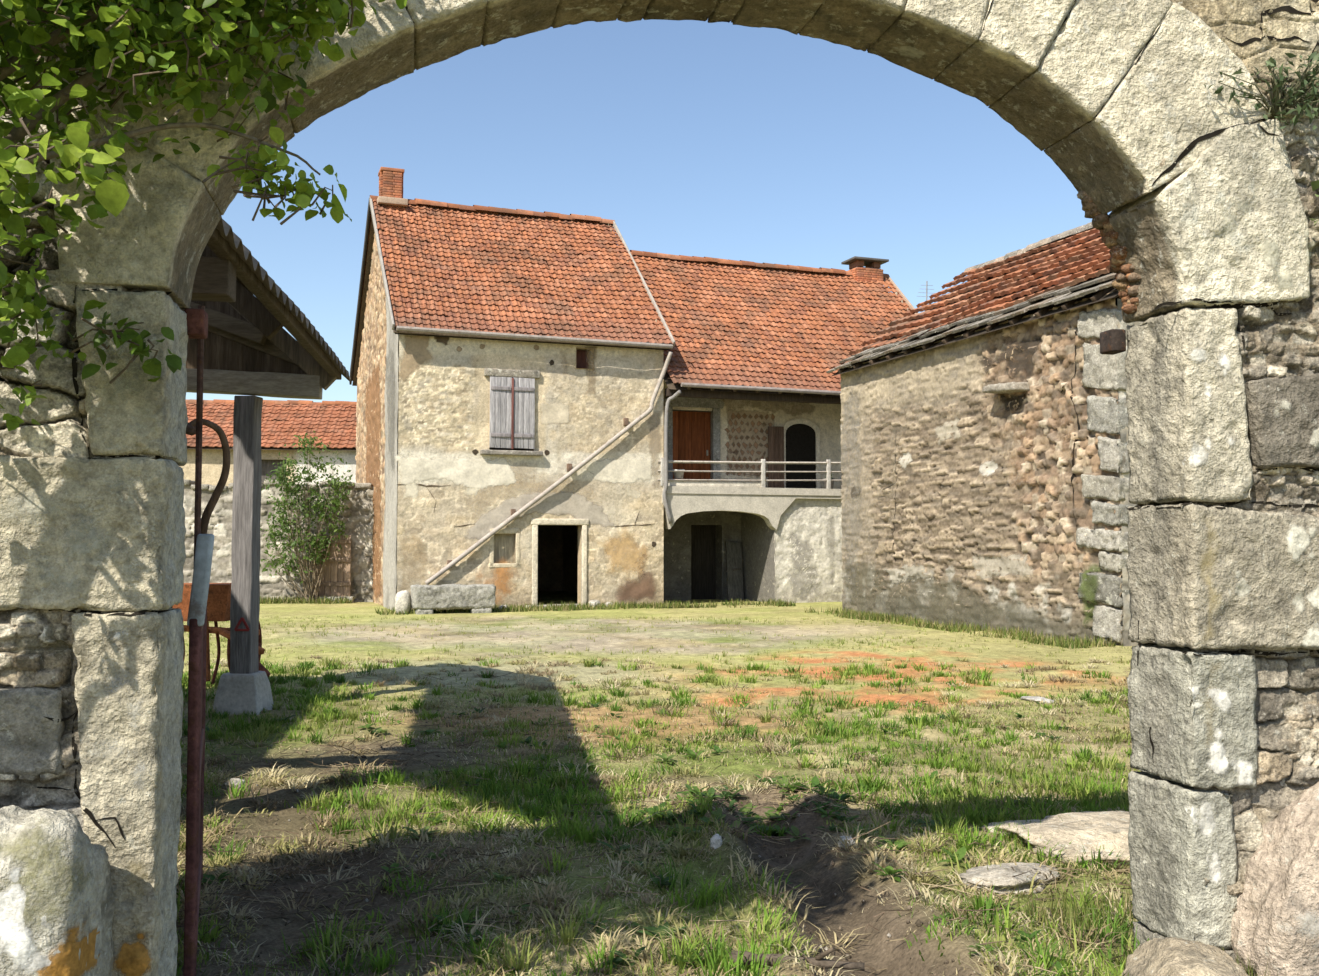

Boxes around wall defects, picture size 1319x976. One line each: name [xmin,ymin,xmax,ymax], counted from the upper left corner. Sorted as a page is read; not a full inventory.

crack [1224,0,1319,61]
crack [1152,118,1280,186]
crack [37,710,125,848]